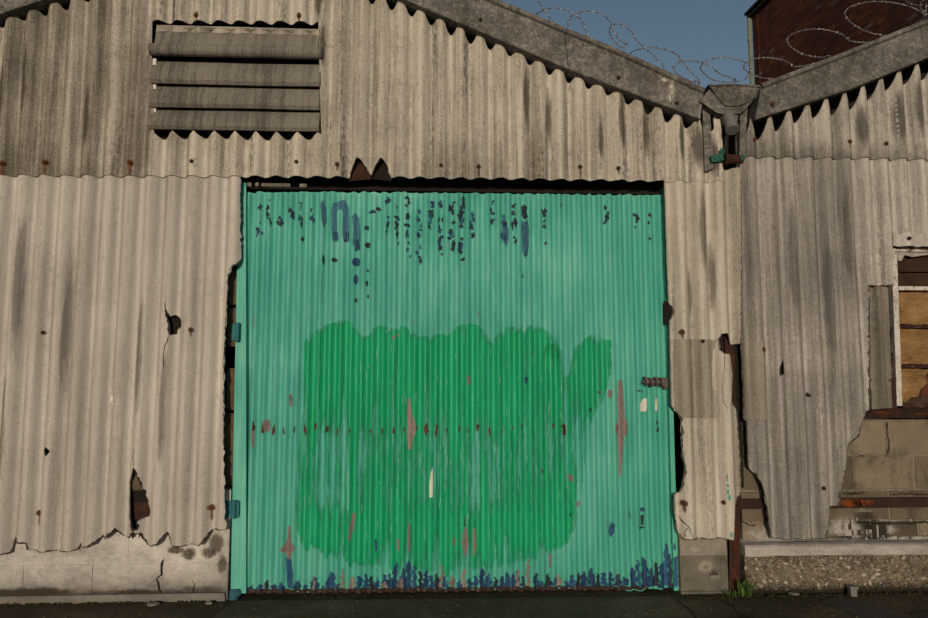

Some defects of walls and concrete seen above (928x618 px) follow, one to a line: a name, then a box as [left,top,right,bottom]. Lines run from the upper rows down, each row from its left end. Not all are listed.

peeling [490,200,529,257]
peeling [597,380,627,476]
peeling [637,390,659,432]
spalling [0,490,231,577]
crack [152,559,164,592]
peeling [247,399,737,590]